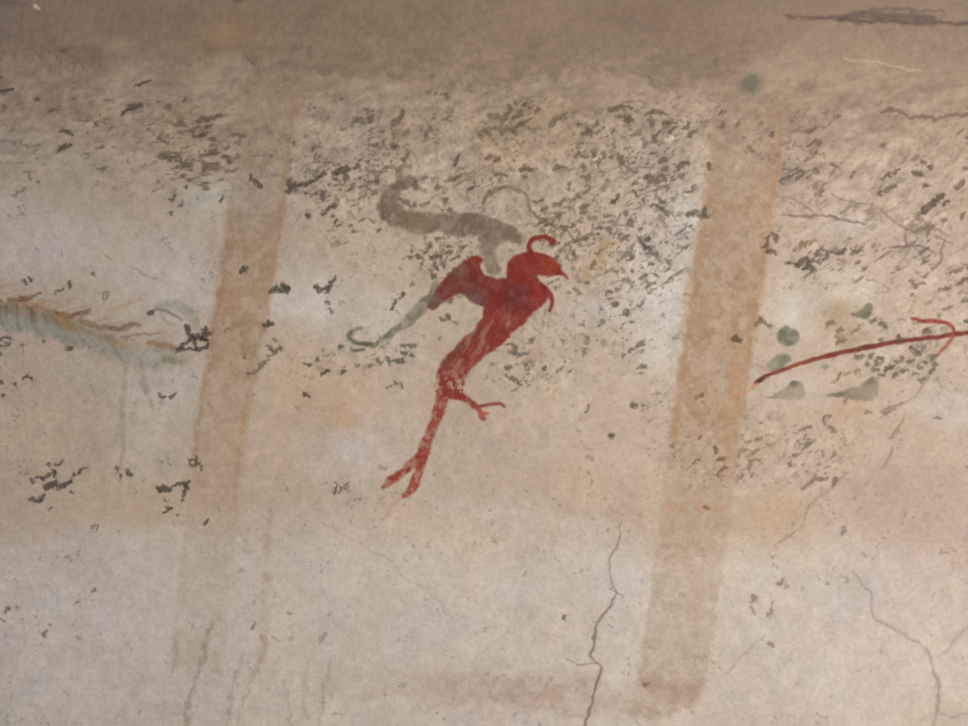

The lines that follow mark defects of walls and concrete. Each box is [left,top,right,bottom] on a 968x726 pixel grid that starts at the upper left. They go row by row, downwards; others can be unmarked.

spalling [486,103,697,145]
spalling [283,161,380,197]
spalling [483,154,586,220]
spalling [876,159,968,227]
spalling [759,231,865,272]
spalling [266,281,291,295]
spalling [311,274,337,316]
spalling [907,257,968,337]
spalling [336,342,418,370]
spalling [824,317,940,385]
crack [566,520,622,726]
crack [851,569,968,726]